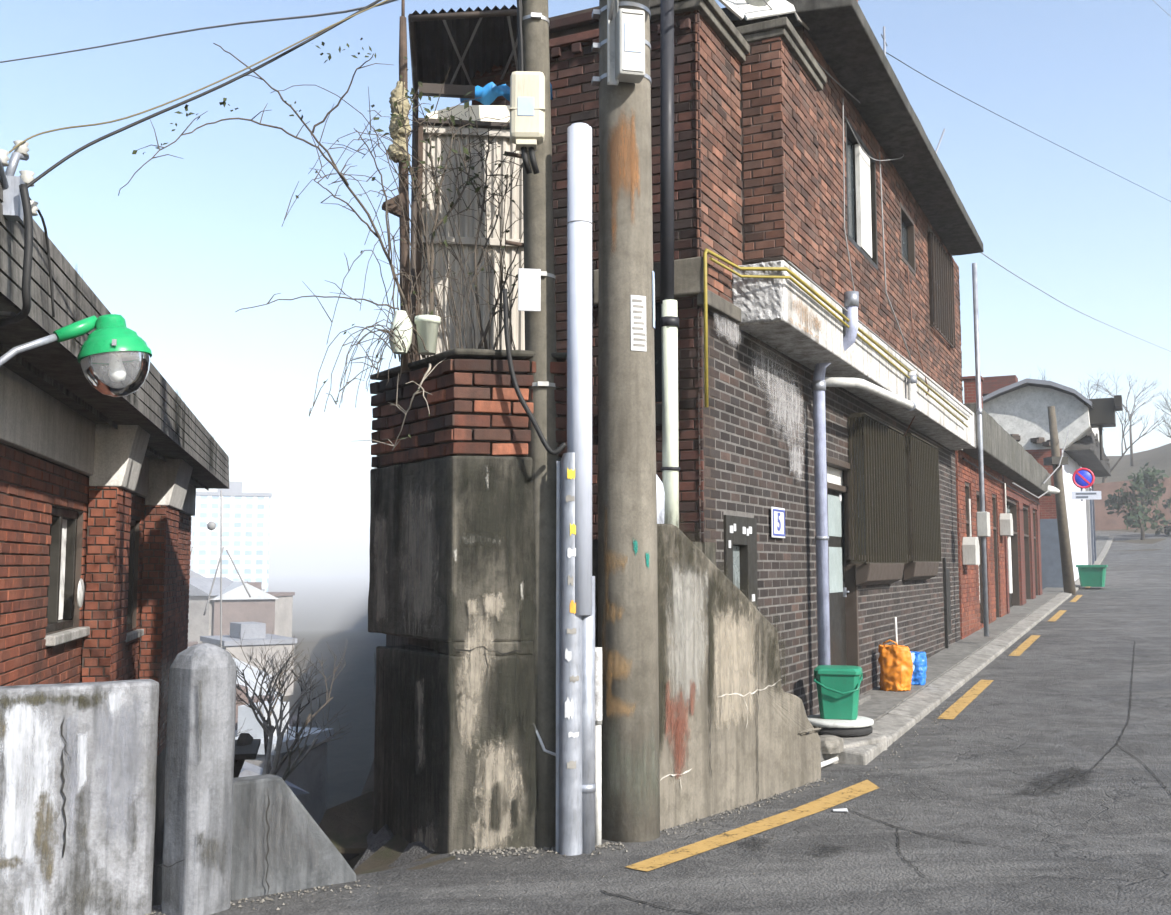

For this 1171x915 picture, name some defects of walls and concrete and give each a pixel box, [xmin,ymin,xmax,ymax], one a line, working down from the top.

rust [609,116,640,246]
efflorescence [716,316,742,341]
efflorescence [754,345,805,479]
crack [61,717,71,856]
damp [57,748,121,915]
damp [379,590,457,830]
damp [454,463,539,830]
rust [665,681,695,777]
crack [660,625,782,799]